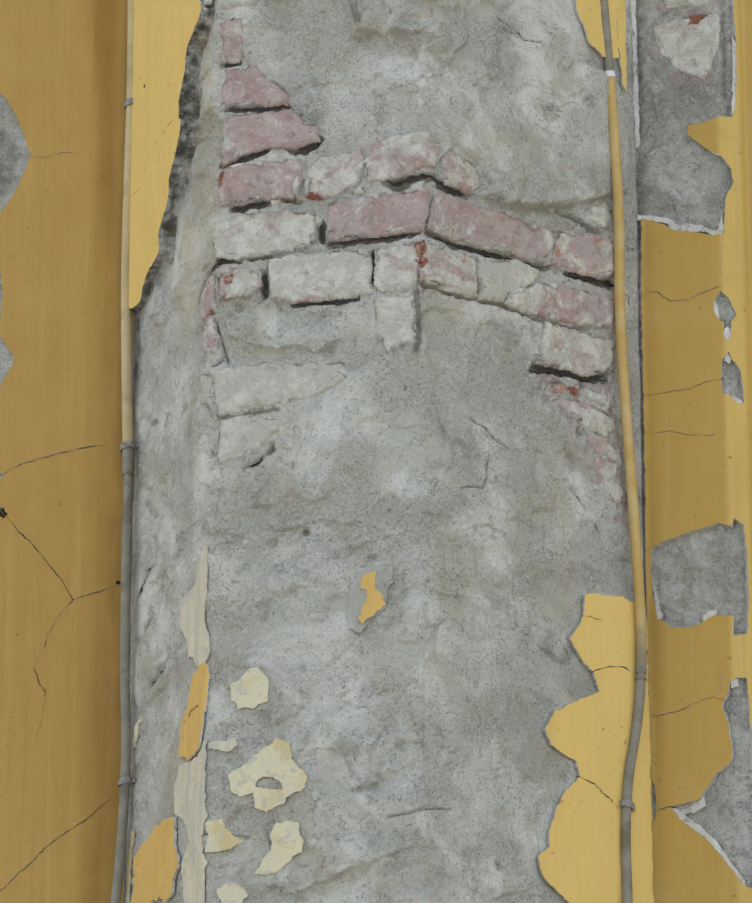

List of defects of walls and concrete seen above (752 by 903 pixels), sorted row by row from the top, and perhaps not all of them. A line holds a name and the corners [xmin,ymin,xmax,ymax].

spalling [0,94,31,212]
spalling [575,0,736,377]
flaking render [200,18,624,503]
crack [0,509,107,603]
spalling [651,522,747,635]
peeling [178,664,237,761]
peeling [230,667,269,709]
peeling [227,738,308,813]
spalling [672,679,752,888]
crack [0,802,106,891]
peeling [125,817,180,903]
peeling [253,820,304,875]